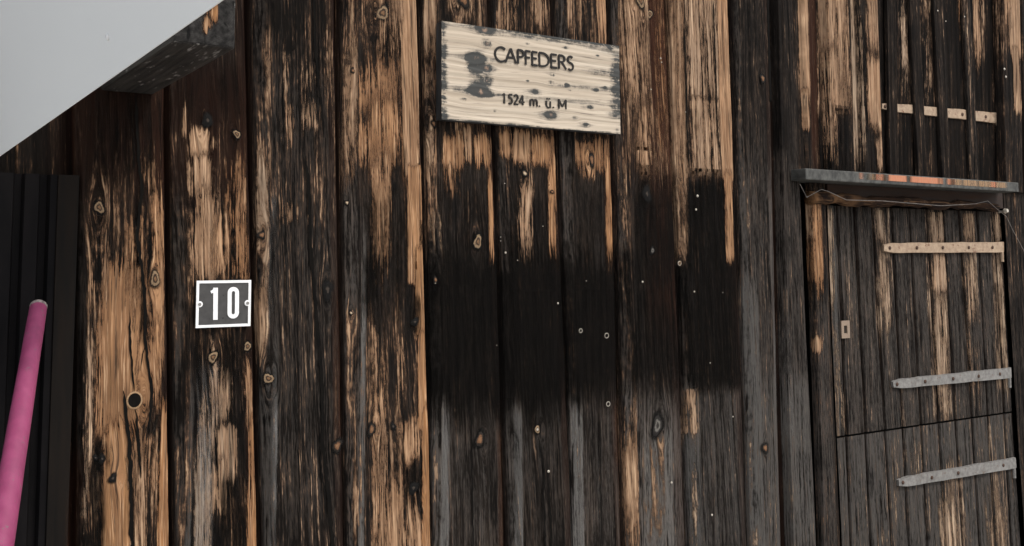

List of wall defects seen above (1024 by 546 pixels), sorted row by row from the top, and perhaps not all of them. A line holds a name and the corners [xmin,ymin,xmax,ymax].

corrosion [872,174,1005,188]